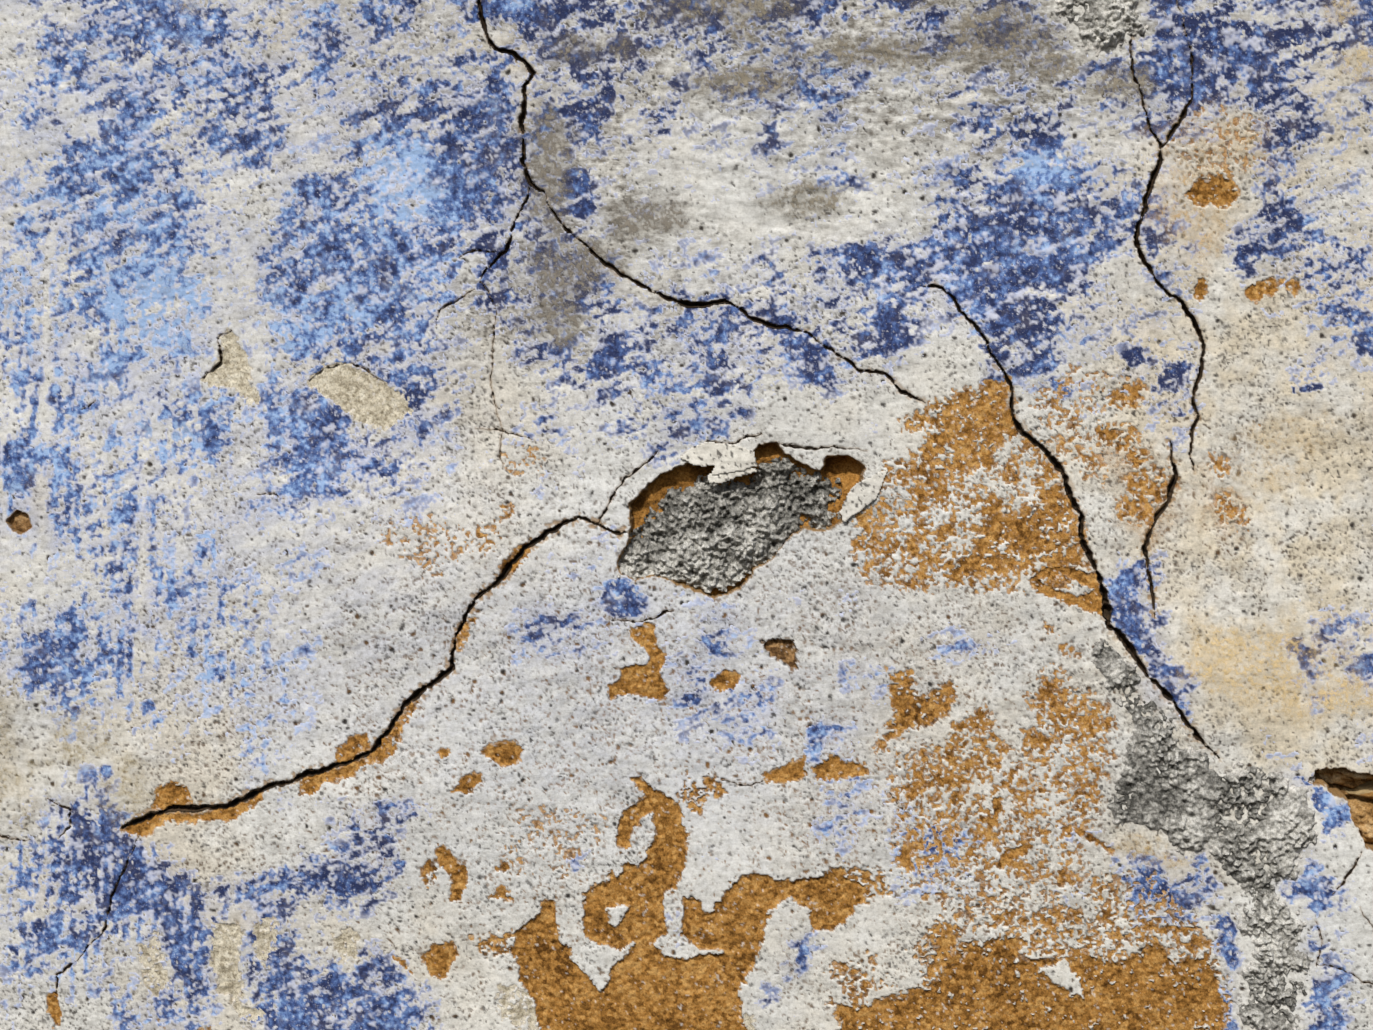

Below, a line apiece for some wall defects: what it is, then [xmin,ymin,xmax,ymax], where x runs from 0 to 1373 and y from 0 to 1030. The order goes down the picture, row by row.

peeling [0,762,468,1030]
crack [56,451,657,994]
crack [436,0,920,463]
peeling [0,0,1373,795]
crack [929,285,1219,758]
crack [1130,1,1205,618]
spalling [1260,721,1373,1030]